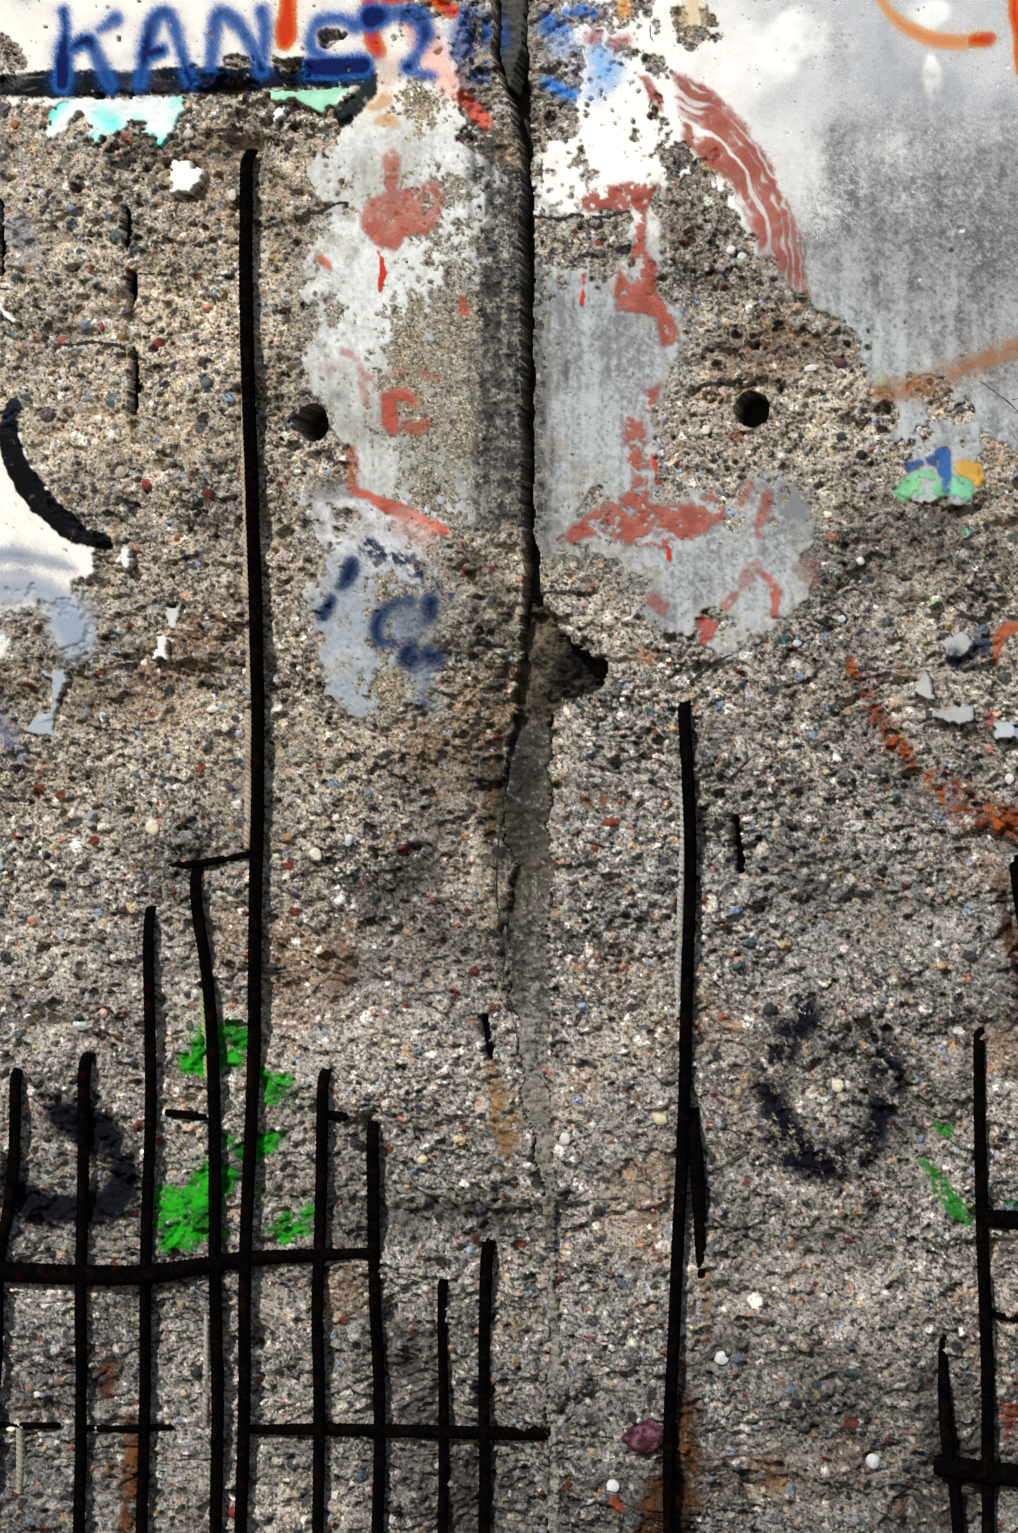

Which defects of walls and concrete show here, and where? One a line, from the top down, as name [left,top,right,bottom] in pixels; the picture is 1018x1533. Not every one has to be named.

crack [533,210,629,221]
spalling [533,200,636,284]
crack [540,588,582,596]
corrosion [846,658,1018,842]
spalling [201,858,249,1032]
crack [495,764,517,1038]
spalling [0,1191,76,1265]
spalling [219,1039,247,1254]
spalling [0,1268,239,1533]
spalling [247,1258,479,1533]
spalling [989,1227,1018,1464]
spalling [994,1485,1018,1533]